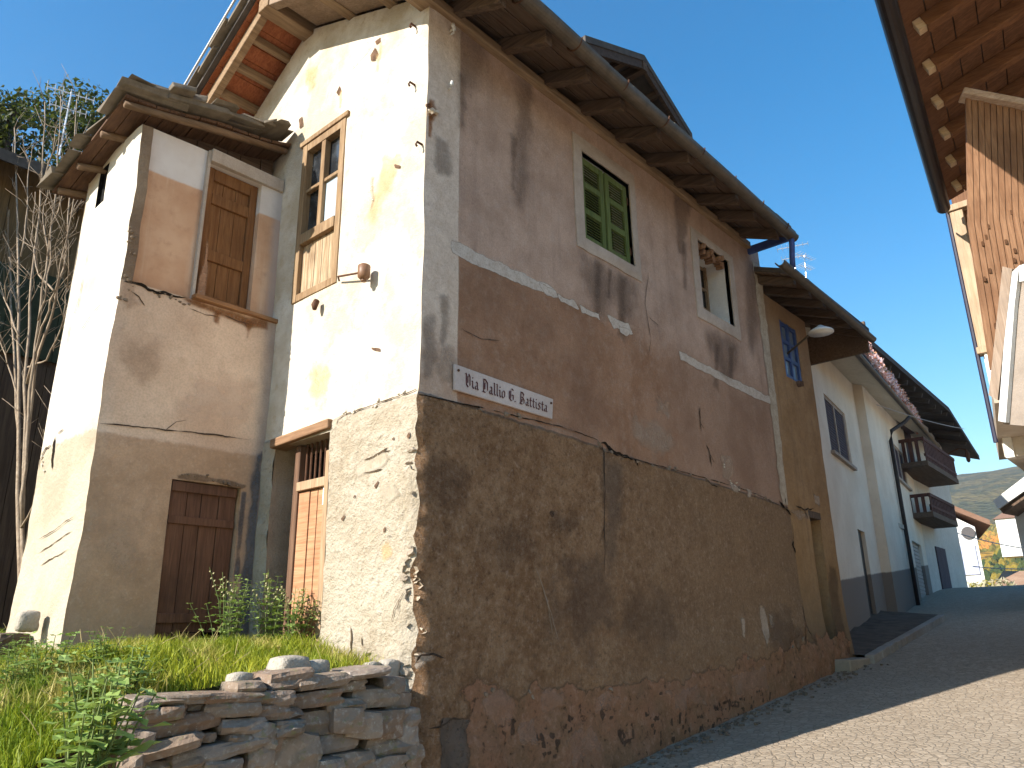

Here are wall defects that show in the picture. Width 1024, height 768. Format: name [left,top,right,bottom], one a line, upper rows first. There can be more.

crack [124,280,247,324]
crack [101,420,250,440]
crack [337,389,814,577]
spalling [400,546,423,603]
spalling [399,652,429,678]